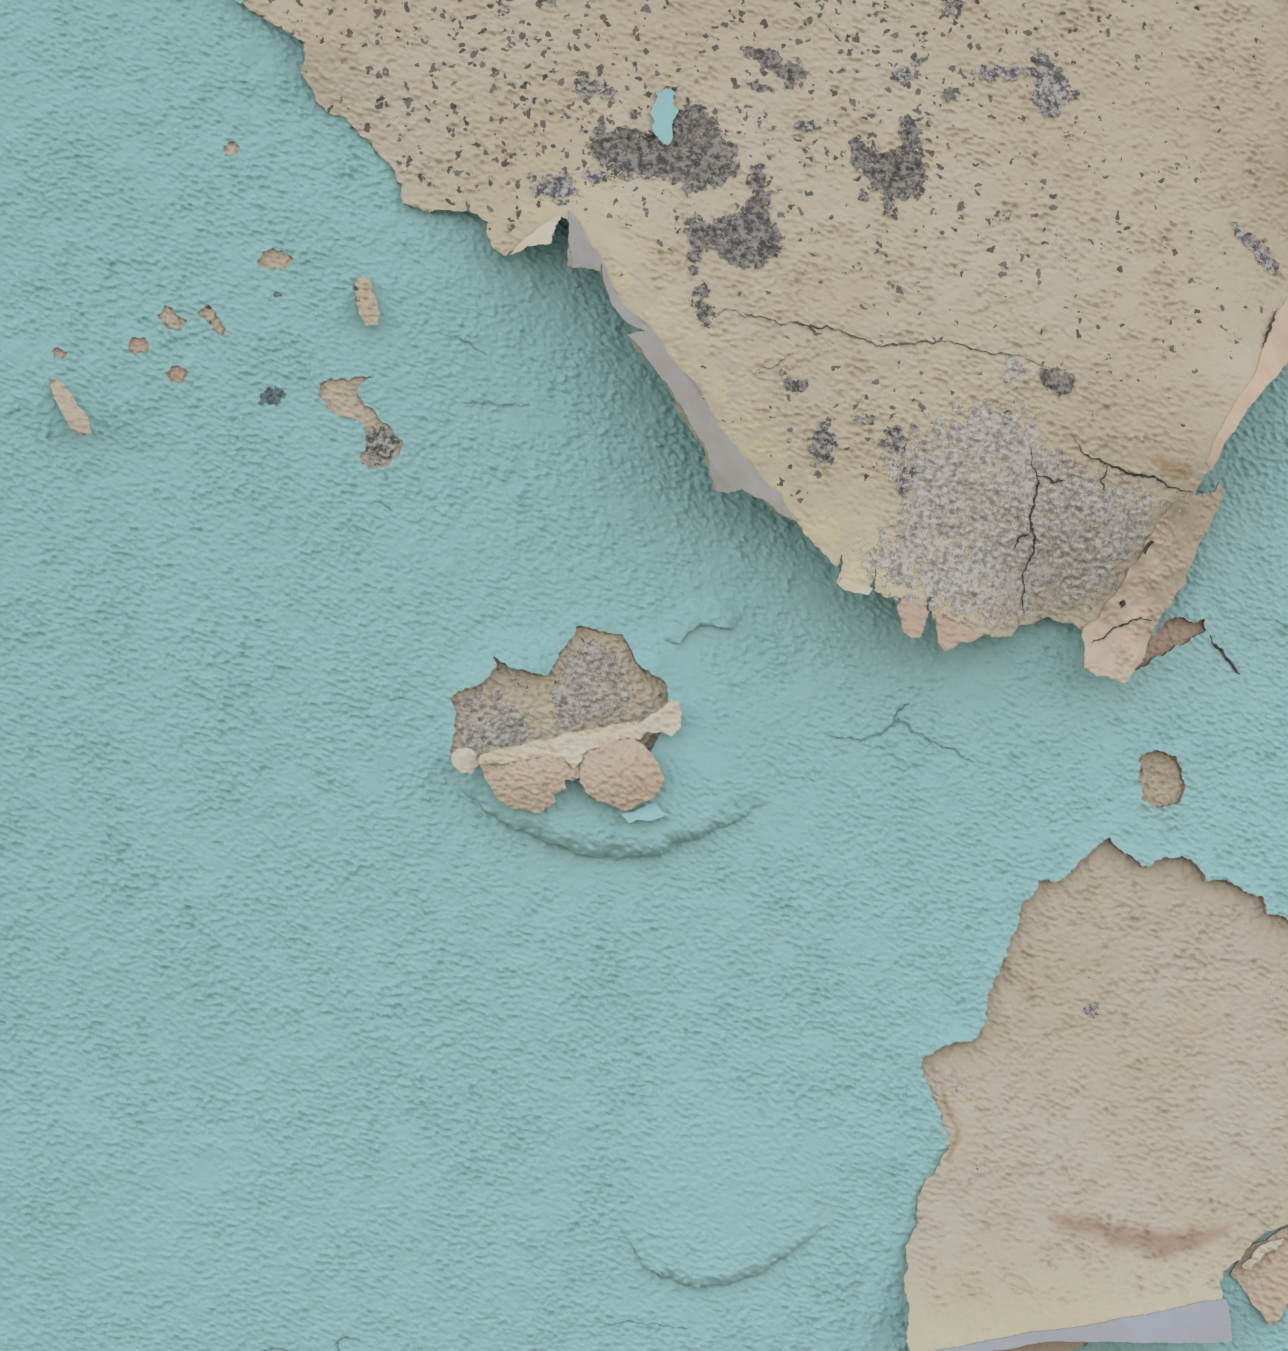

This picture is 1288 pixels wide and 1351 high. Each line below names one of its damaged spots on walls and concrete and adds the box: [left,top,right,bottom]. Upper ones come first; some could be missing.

peeling [223,142,239,156]
peeling [157,305,226,335]
peeling [234,0,1288,684]
peeling [164,366,188,383]
peeling [49,379,92,437]
crack [1073,437,1193,492]
crack [1013,447,1065,616]
peeling [450,626,682,823]
peeling [1138,750,1183,807]
peeling [903,838,1288,1351]